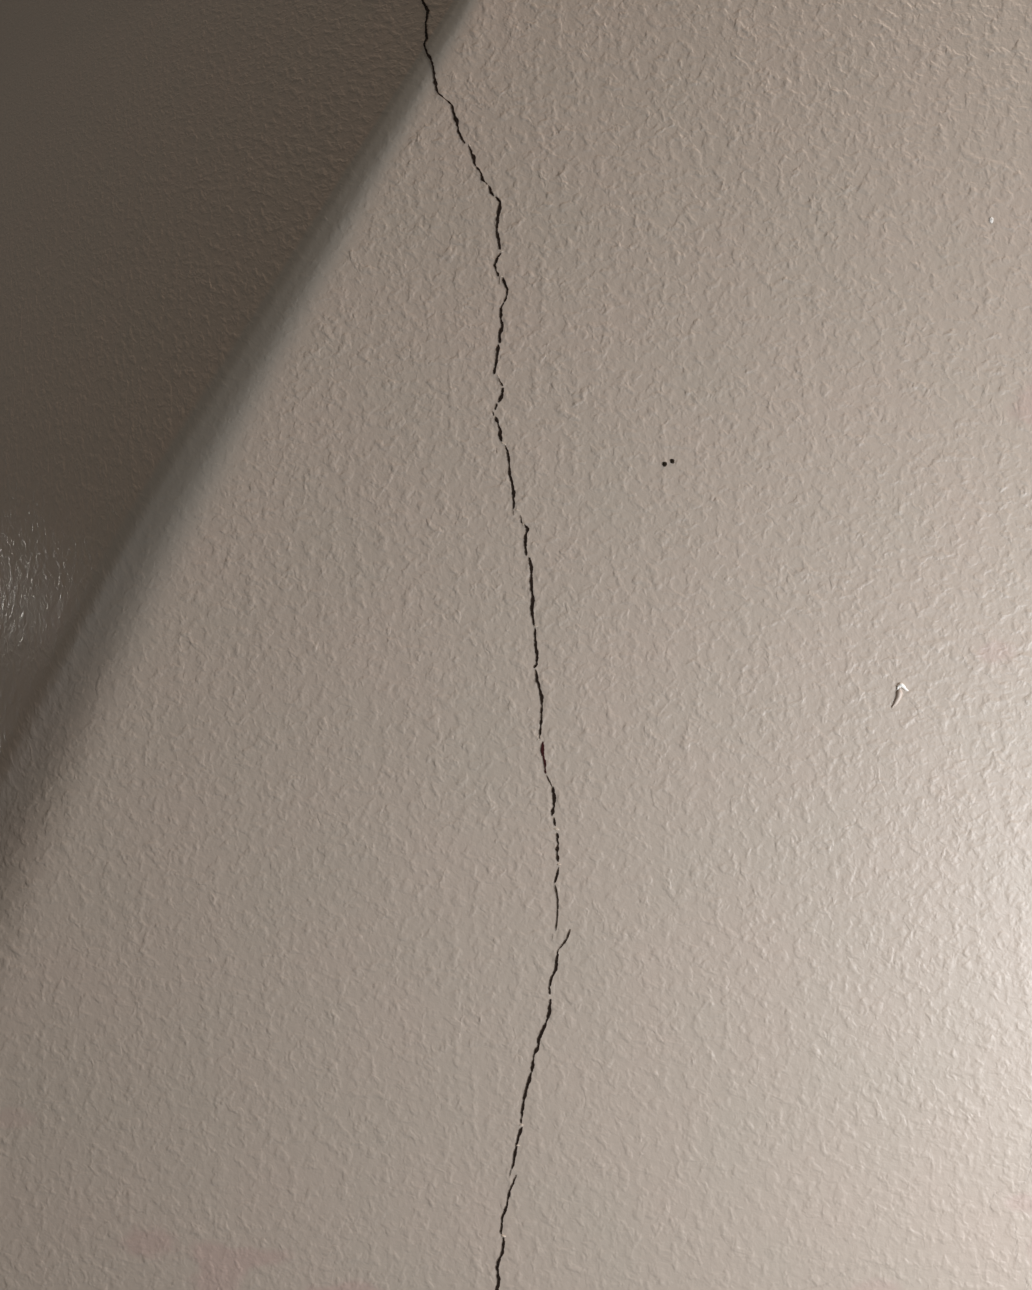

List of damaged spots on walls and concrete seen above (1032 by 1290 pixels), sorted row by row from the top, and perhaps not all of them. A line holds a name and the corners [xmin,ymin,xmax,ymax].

crack [421,0,571,1290]